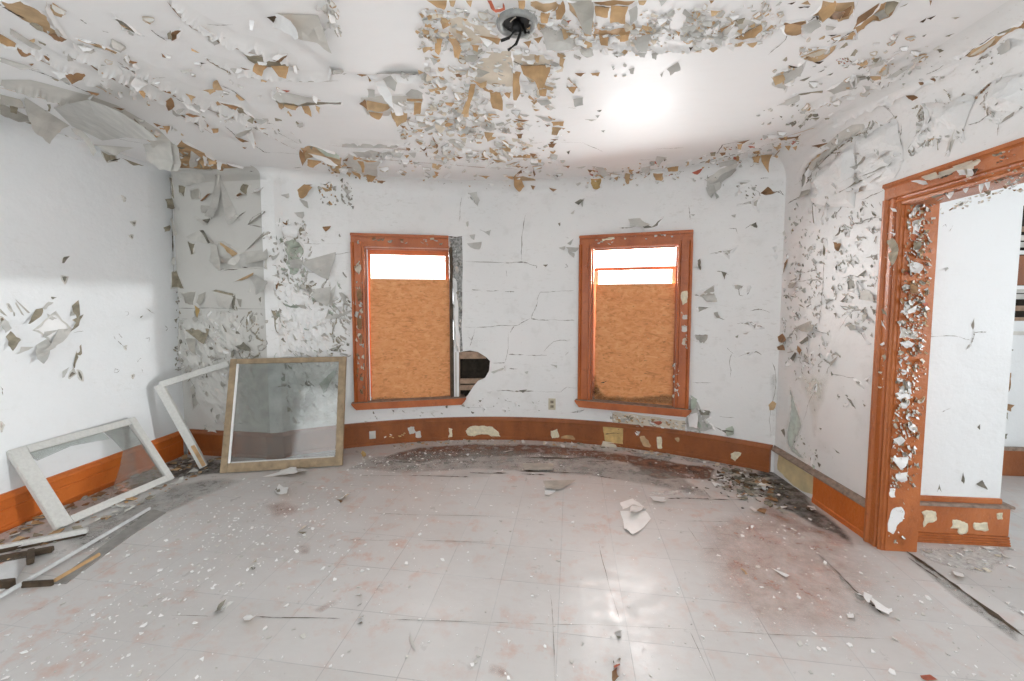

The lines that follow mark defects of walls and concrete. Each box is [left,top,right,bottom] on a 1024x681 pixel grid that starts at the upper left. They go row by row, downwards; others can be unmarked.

peeling [0,0,1024,543]
crack [470,218,573,393]